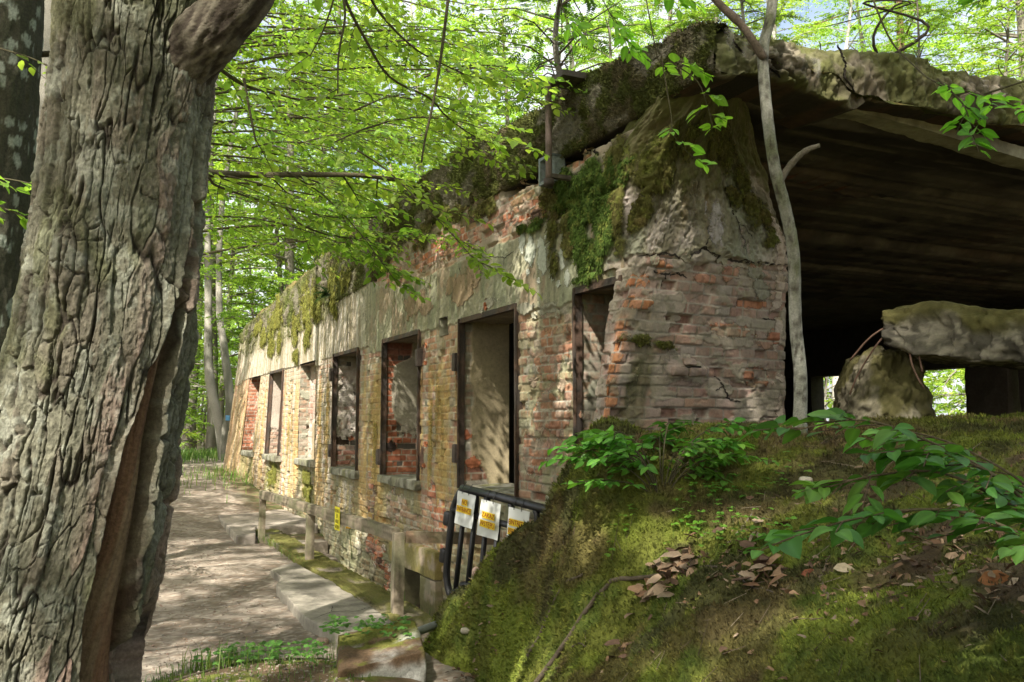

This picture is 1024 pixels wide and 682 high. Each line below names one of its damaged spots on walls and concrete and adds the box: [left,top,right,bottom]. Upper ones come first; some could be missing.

flaking render [414,196,570,313]
spalling [623,253,691,311]
crack [640,203,788,286]
water stain [705,201,724,245]
peeling [694,210,788,352]
peeling [336,383,356,445]
peeling [386,424,417,452]
spalling [517,302,584,478]
crack [714,372,741,402]
spalling [744,366,784,417]
spalling [367,471,447,552]
spalling [354,530,391,591]